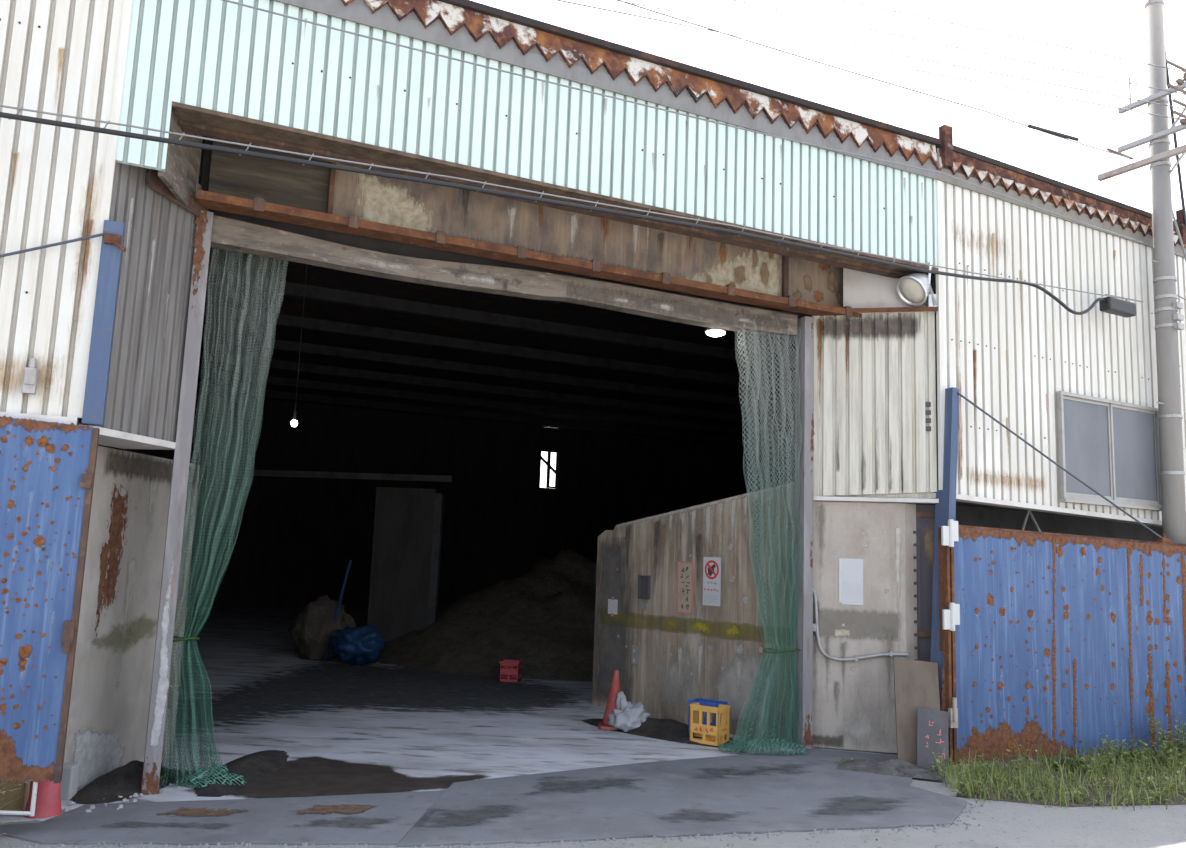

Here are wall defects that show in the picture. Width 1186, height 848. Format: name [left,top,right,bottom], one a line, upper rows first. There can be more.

corrosion [80,187,93,293]
corrosion [191,209,208,309]
corrosion [0,414,90,616]
corrosion [95,484,131,645]
corrosion [0,630,57,782]
corrosion [957,527,1186,765]